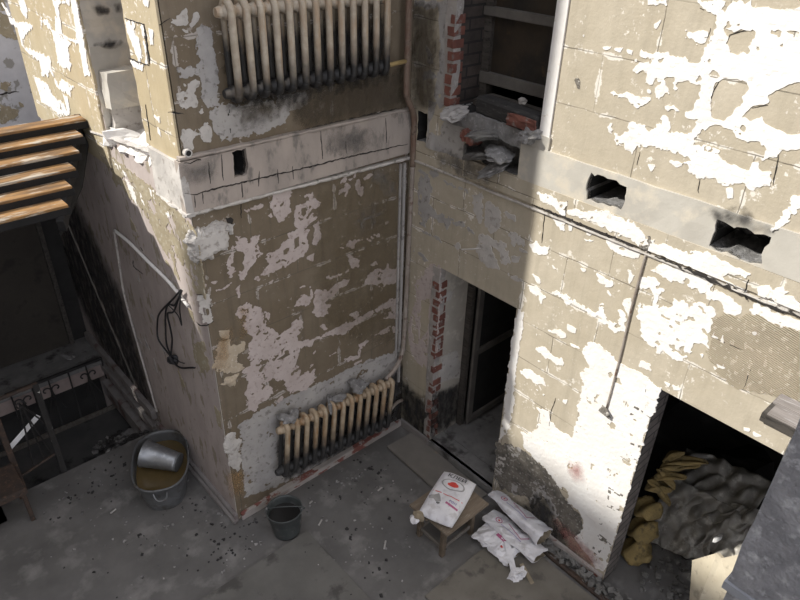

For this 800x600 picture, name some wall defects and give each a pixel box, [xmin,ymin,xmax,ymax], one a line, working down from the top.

peeling [0,102,24,124]
peeling [0,0,91,117]
peeling [171,8,308,150]
crack [176,108,407,218]
peeling [603,0,800,199]
peeling [99,152,461,498]
flaking render [472,191,800,402]
crack [532,204,800,318]
peeling [493,309,681,571]